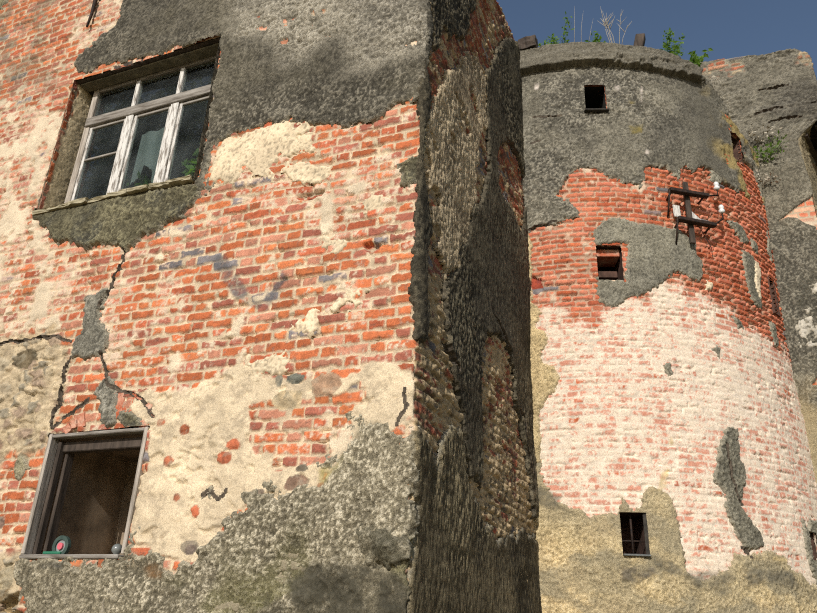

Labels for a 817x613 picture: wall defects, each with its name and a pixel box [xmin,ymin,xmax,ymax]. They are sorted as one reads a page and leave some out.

peeling [32,0,477,254]
crack [97,247,125,307]
peeling [283,308,320,339]
peeling [330,285,371,322]
peeling [397,37,817,613]
crack [0,334,90,429]
crack [98,350,155,418]
peeling [244,349,289,382]
peeling [0,411,420,613]